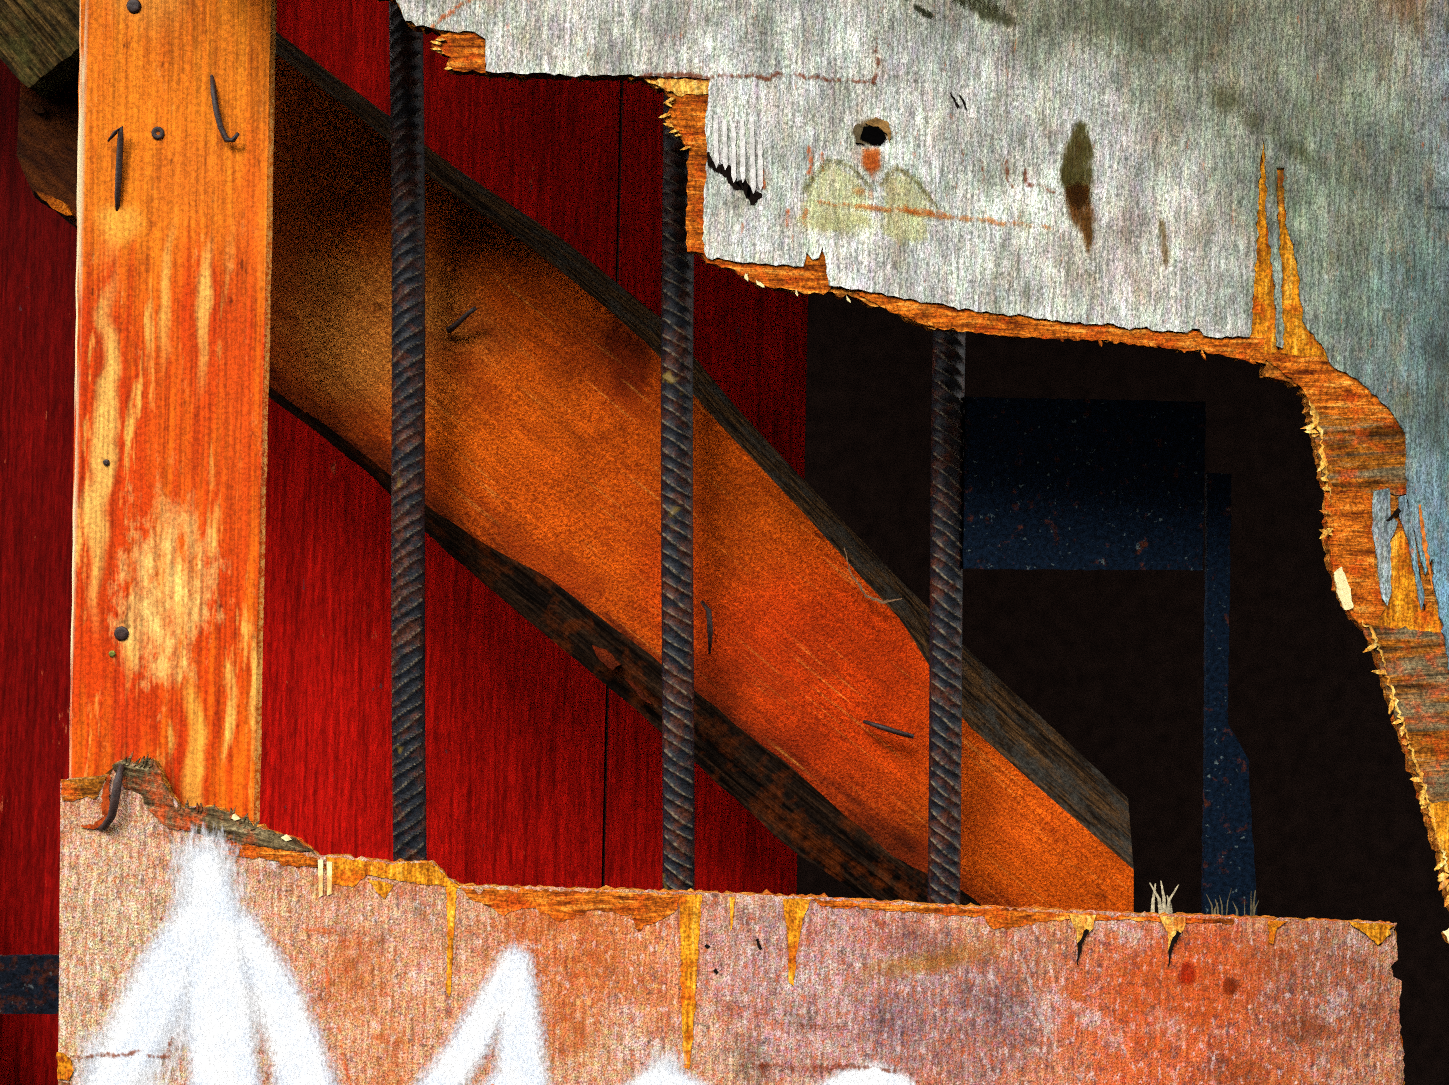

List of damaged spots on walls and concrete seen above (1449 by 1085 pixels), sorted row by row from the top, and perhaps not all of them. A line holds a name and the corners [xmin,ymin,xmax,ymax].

spalling [213,1,832,1069]
peeling [783,140,1449,986]